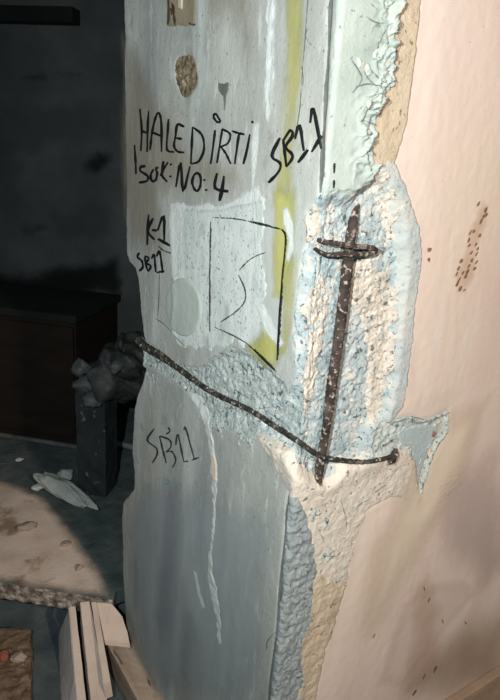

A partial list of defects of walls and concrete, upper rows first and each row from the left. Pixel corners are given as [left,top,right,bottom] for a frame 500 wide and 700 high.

spalling [142,0,449,700]
rust [456,202,488,291]